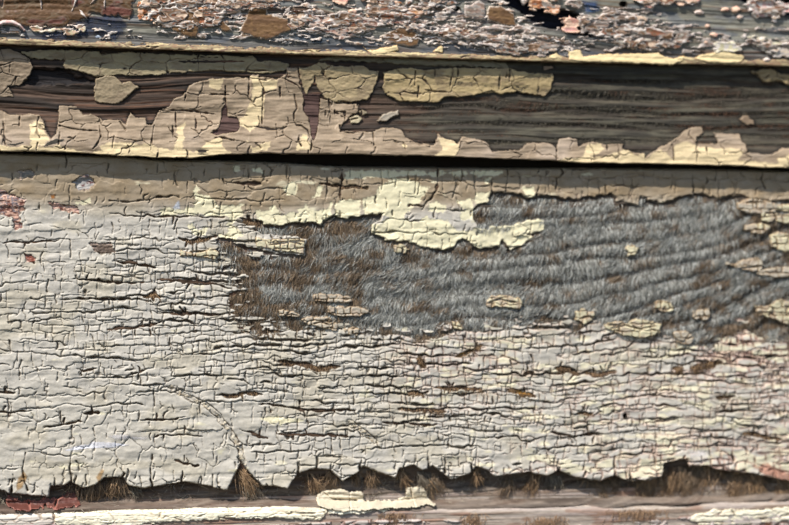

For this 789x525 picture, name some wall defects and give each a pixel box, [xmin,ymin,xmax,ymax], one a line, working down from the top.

peeling [0,0,789,103]
peeling [377,110,399,122]
crack [109,196,262,247]
peeling [725,211,789,279]
crack [77,260,231,335]
peeling [754,299,789,325]
crack [278,359,340,376]
crack [554,362,616,383]
crack [219,391,355,440]
crack [382,382,483,427]
peeling [0,486,436,525]
peeling [631,507,789,525]